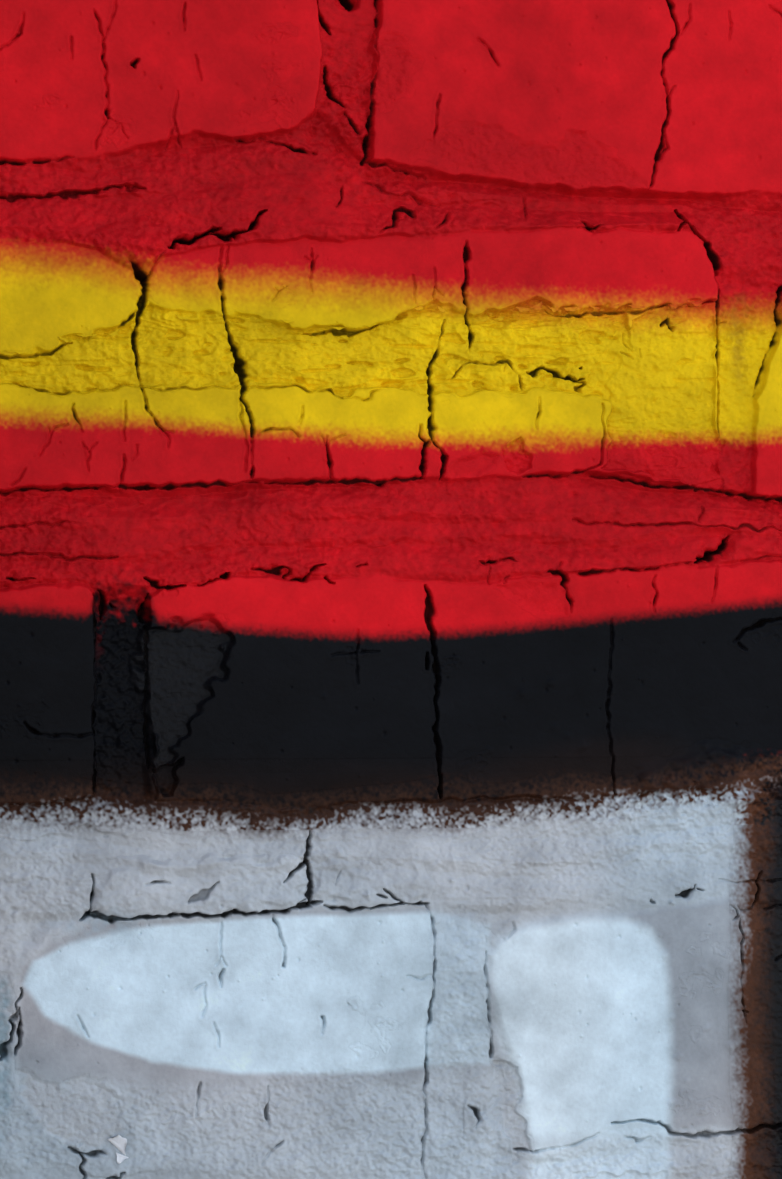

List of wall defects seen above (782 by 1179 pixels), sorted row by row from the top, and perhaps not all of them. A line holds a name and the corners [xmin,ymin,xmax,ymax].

crack [433,94,441,140]
crack [476,37,501,67]
crack [646,0,692,191]
crack [769,4,782,17]
crack [0,246,389,492]
crack [361,158,542,481]
spalling [127,612,236,775]
crack [424,584,443,799]
crack [144,879,171,887]